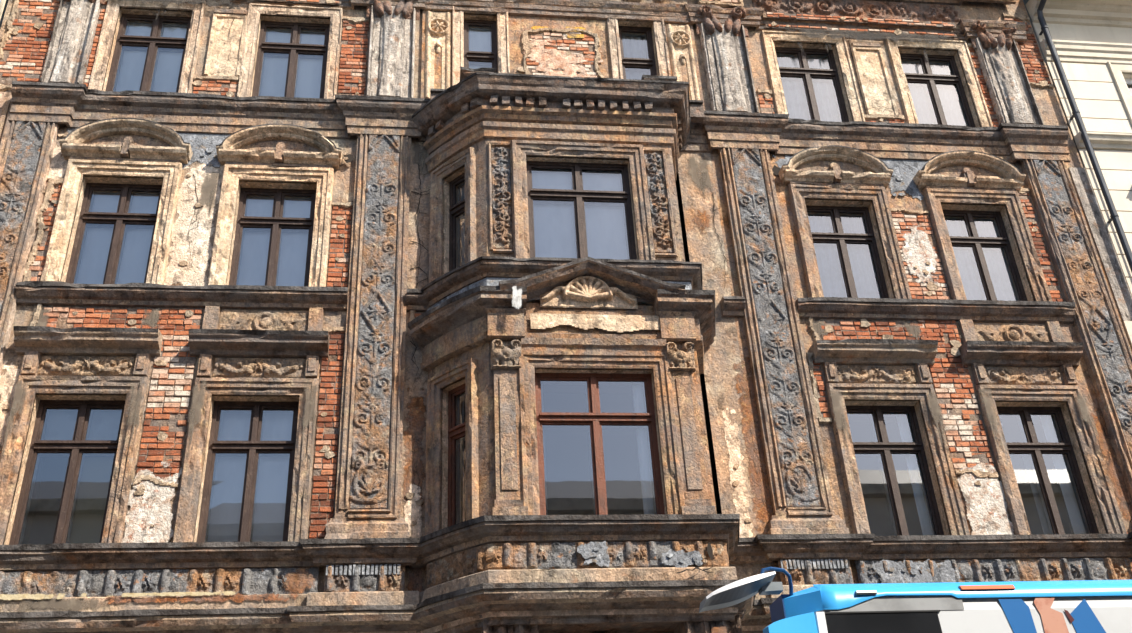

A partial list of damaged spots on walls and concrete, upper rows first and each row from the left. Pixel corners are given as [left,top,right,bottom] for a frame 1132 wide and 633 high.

flaking render [0,0,60,92]
flaking render [83,2,108,88]
flaking render [193,76,239,97]
flaking render [272,0,370,96]
flaking render [517,27,604,78]
flaking render [23,128,74,281]
flaking render [327,202,353,287]
peeling [770,153,792,177]
flaking render [880,159,951,299]
flaking render [30,304,203,543]
flaking render [806,317,1030,535]